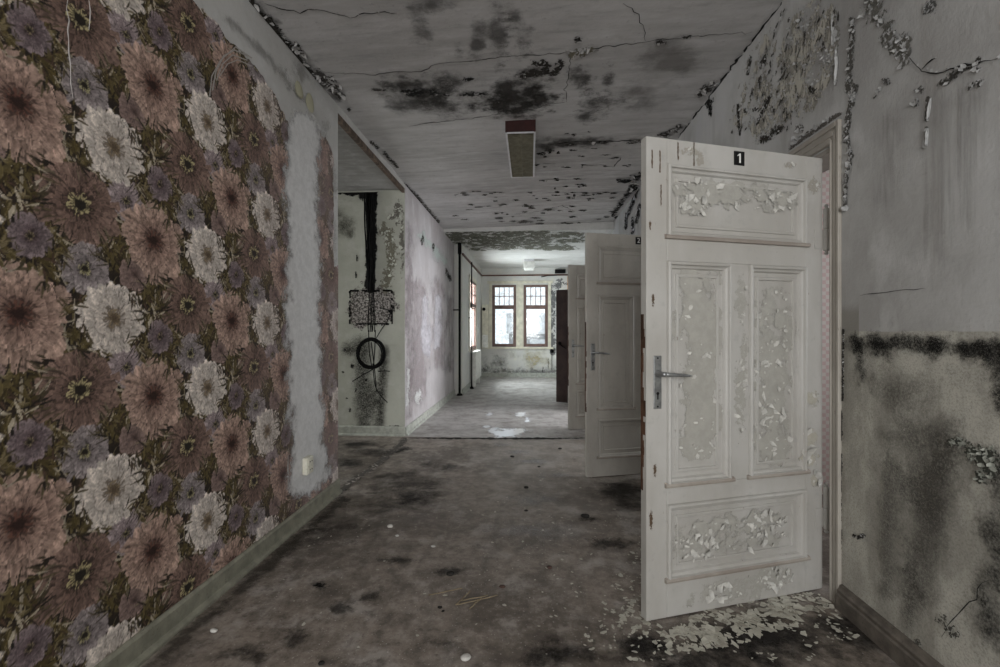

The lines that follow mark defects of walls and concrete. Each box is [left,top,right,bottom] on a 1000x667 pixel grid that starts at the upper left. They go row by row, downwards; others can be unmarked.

crack [267,4,393,19]
mould [391,77,459,111]
leakage [471,69,555,118]
crack [328,2,782,138]
spalling [731,0,912,213]
spalling [937,56,985,91]
spalling [404,131,641,251]
crack [522,139,638,214]
flaking render [283,112,331,497]
spalling [345,199,405,331]
leakage [849,334,1000,412]
leakage [977,518,1000,652]